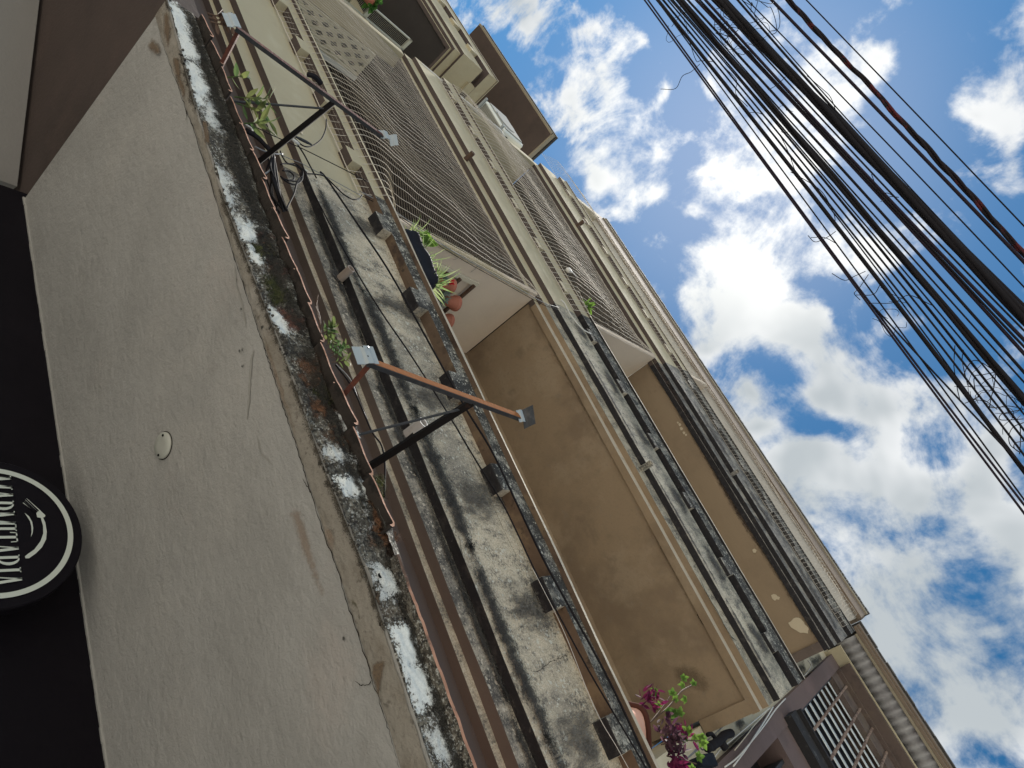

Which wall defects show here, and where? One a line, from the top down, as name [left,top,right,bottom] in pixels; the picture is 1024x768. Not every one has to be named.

crack [156,22,399,767]
water stain [187,12,464,768]
water stain [309,185,609,768]
mould [654,474,725,584]
peeling [788,617,809,633]